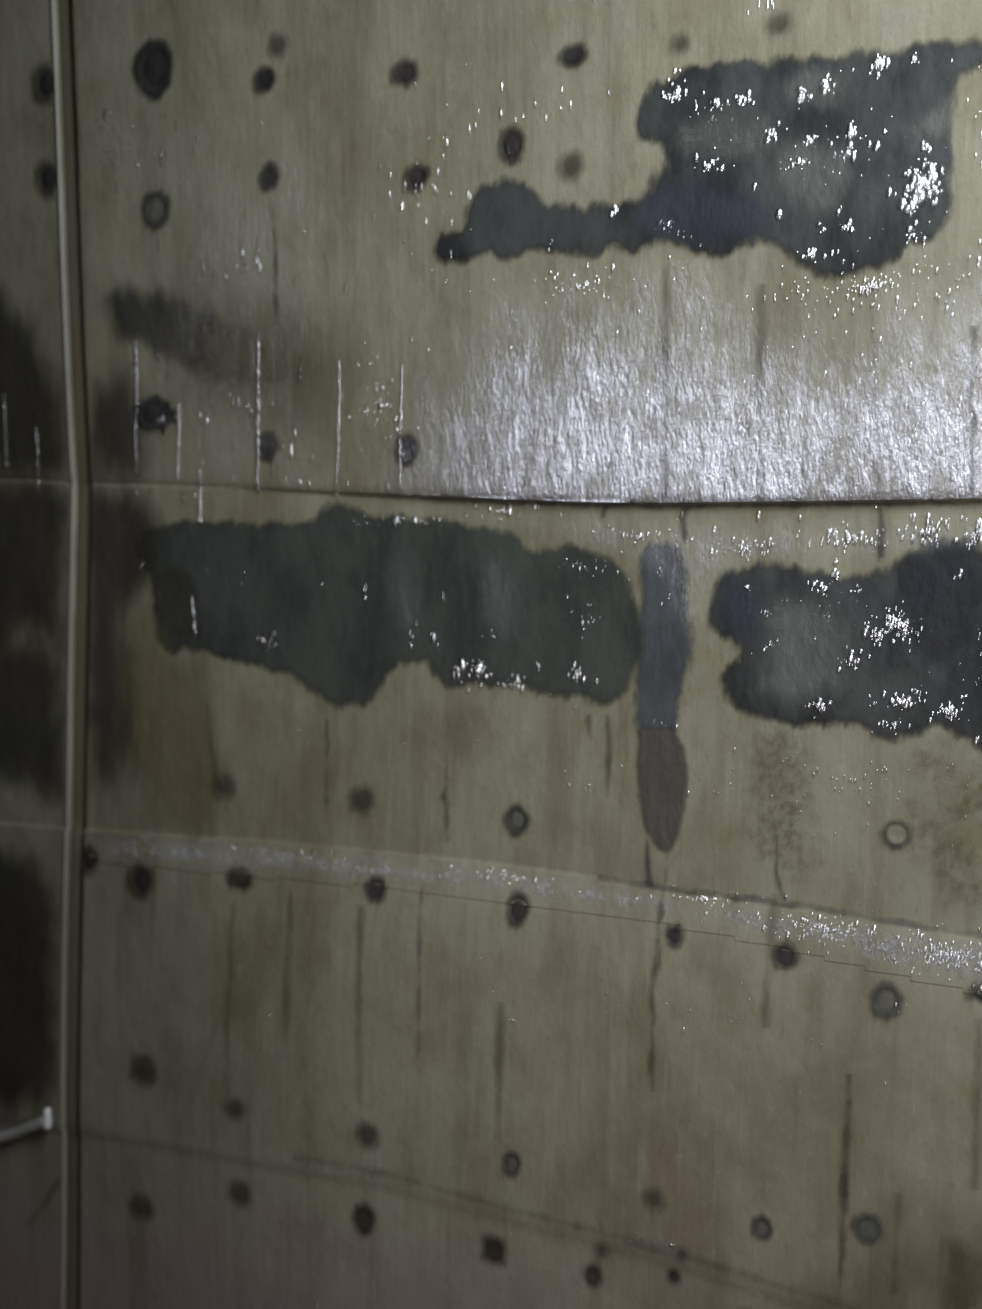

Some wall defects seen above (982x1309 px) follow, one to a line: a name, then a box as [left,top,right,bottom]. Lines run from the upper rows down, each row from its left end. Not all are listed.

leakage [436,39,982,277]
leakage [112,289,317,388]
leakage [0,300,67,794]
leakage [88,494,692,850]
leakage [710,539,982,750]
leakage [0,855,54,1105]
crack [633,847,928,928]